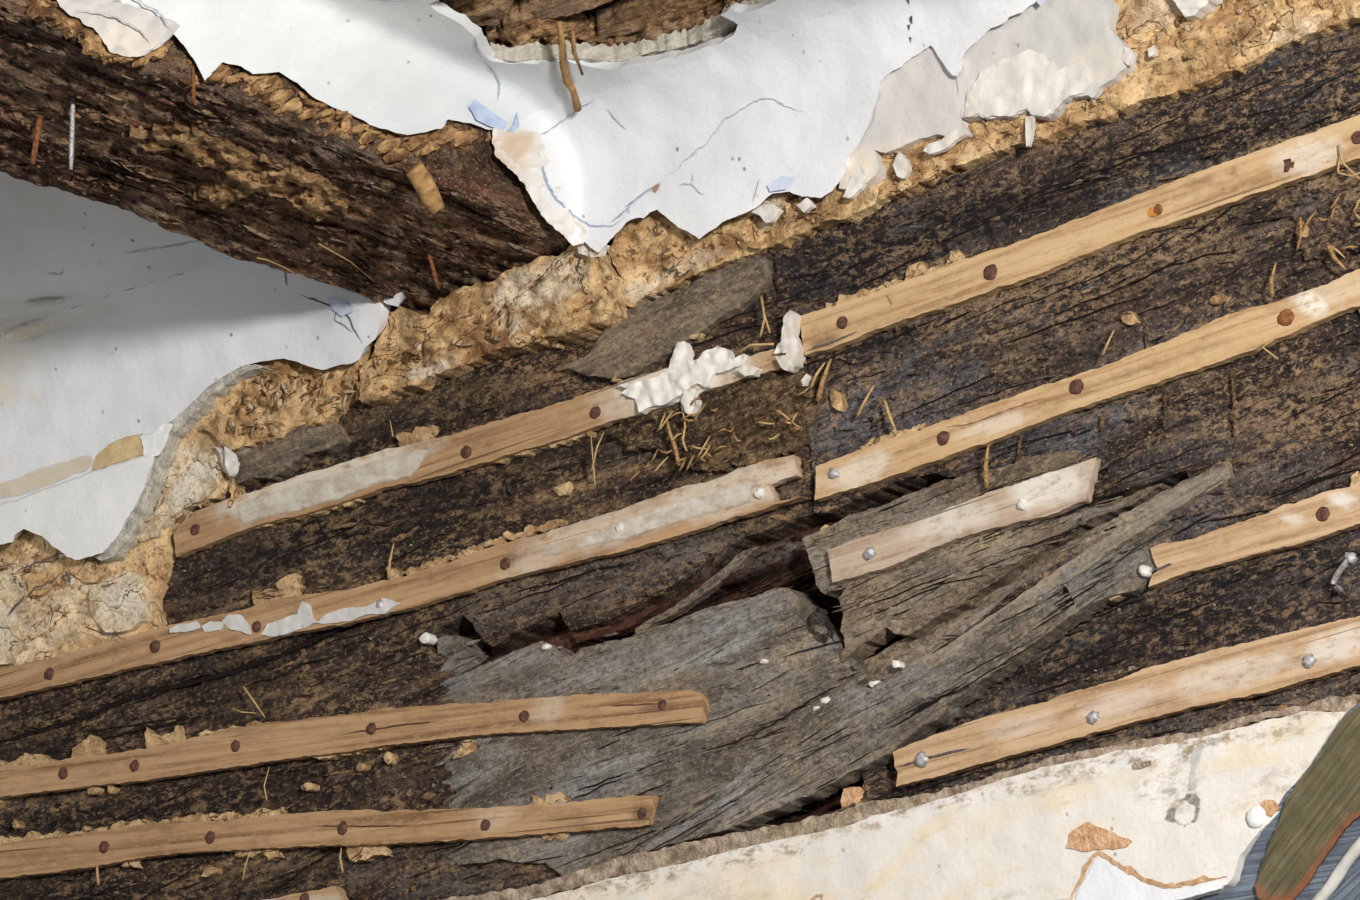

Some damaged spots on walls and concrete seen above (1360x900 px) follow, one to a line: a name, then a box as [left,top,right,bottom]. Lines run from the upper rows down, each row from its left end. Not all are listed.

peeling [0,0,542,295]
spalling [469,99,610,257]
spalling [439,0,767,66]
peeling [751,176,816,224]
peeling [877,169,1001,286]
spalling [839,0,1158,200]
spalling [92,364,273,563]
peeling [799,342,939,482]
peeling [343,608,437,647]
peeling [275,748,407,810]
peeling [1066,822,1225,900]
peeling [1255,707,1360,900]